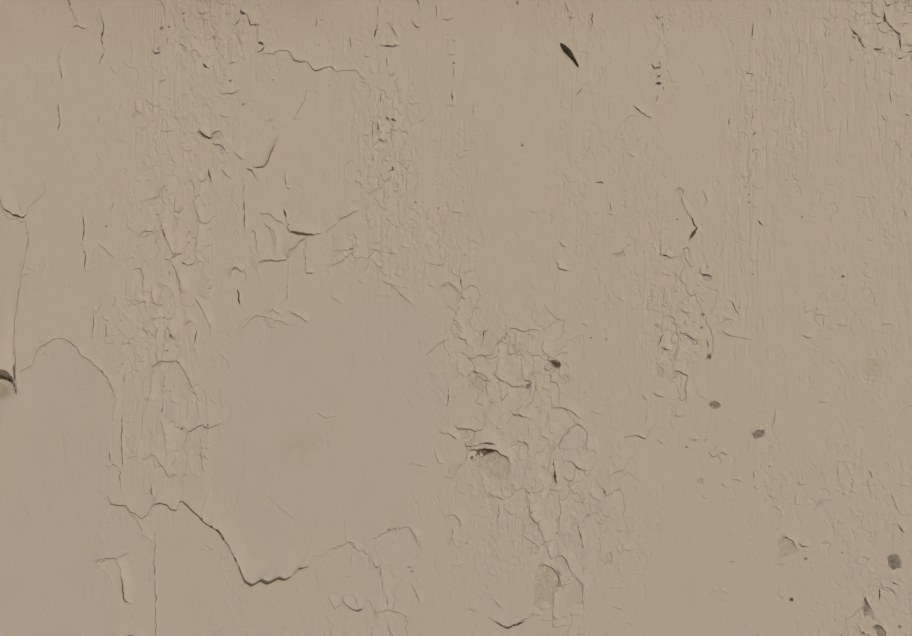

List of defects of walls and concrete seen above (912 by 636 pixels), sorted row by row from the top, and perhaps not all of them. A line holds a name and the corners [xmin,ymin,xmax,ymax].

peeling [197,123,321,306]
peeling [435,291,604,636]
peeling [370,523,426,636]
crack [488,602,538,631]